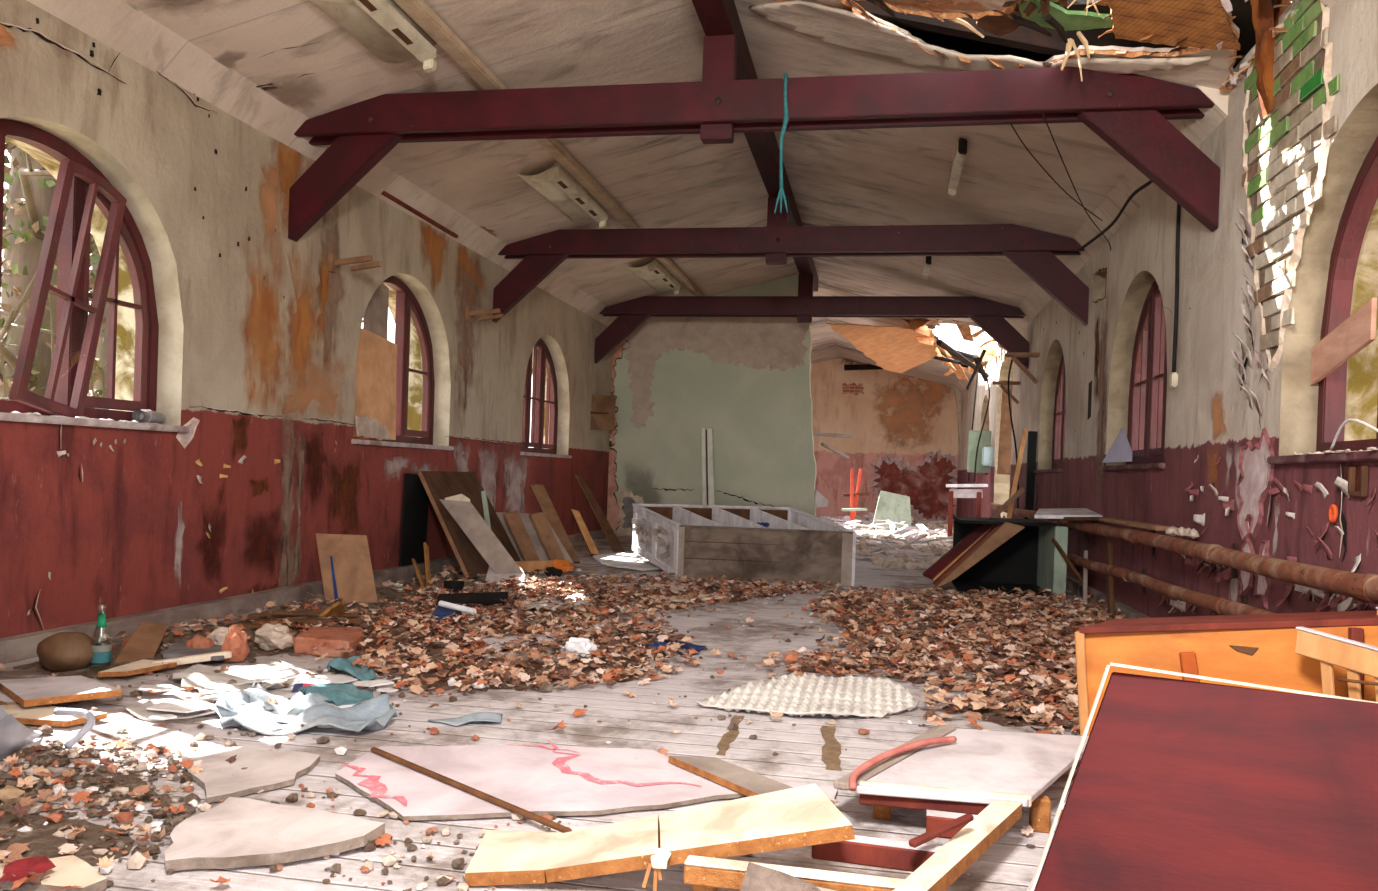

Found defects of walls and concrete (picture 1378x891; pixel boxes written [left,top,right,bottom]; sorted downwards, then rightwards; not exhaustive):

spalling [884,2,1016,19]
crack [0,22,127,84]
spalling [1051,48,1206,63]
crack [158,72,218,114]
flaking render [1184,0,1350,562]
flaking render [842,382,865,396]
peeling [607,317,809,559]
spalling [868,448,958,522]
peeling [1156,595,1197,616]
peeling [1182,555,1368,612]